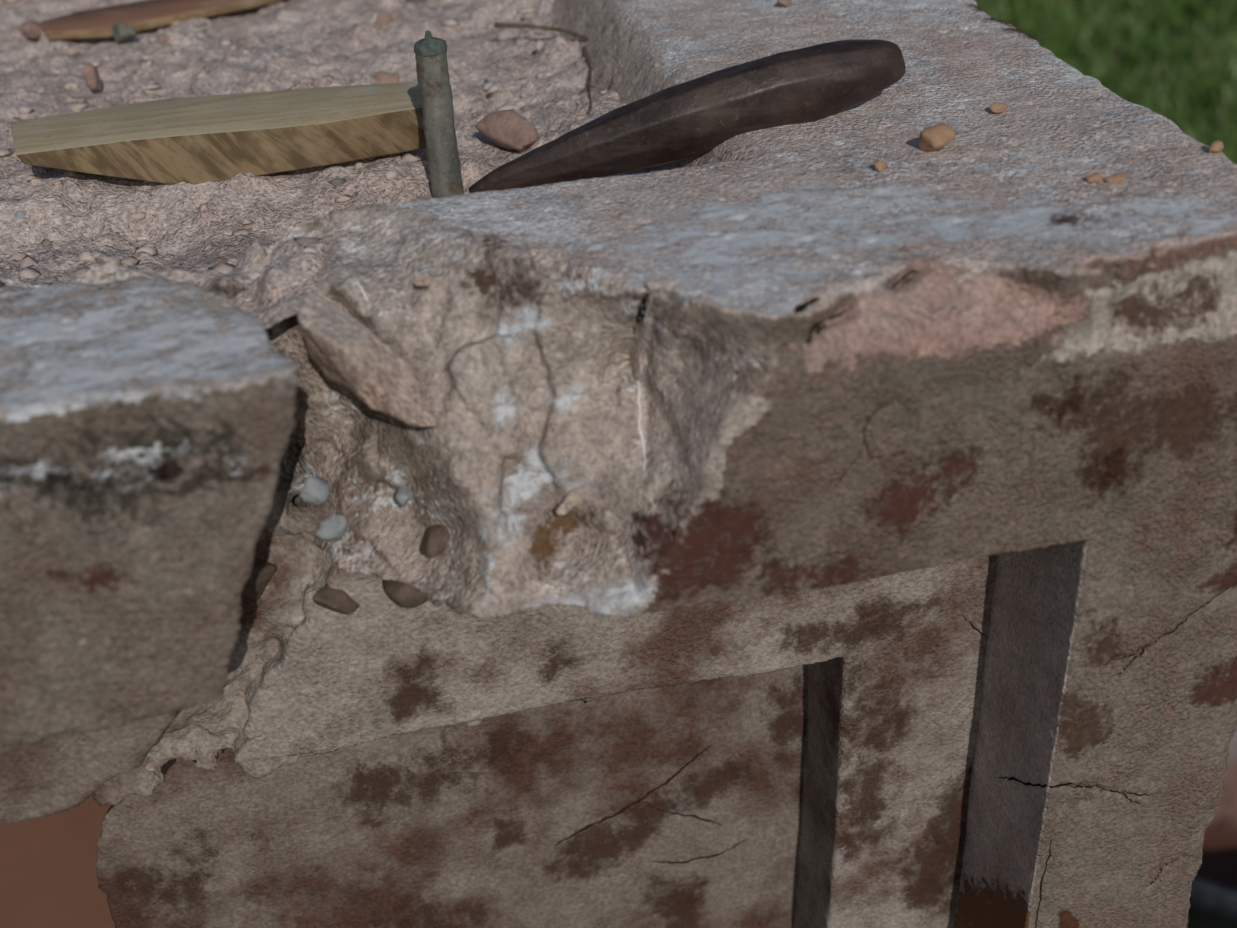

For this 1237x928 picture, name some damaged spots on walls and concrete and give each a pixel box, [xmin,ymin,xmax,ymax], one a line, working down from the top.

spalling [297,204,780,619]
rust [1031,370,1237,495]
rust [631,486,859,601]
rust [865,441,980,541]
water stain [391,658,439,721]
water stain [783,598,939,653]
crack [1096,586,1233,676]
rust [1192,659,1237,708]
water stain [545,762,750,880]
crack [554,745,748,864]
water stain [839,664,909,860]
crack [998,776,1153,804]